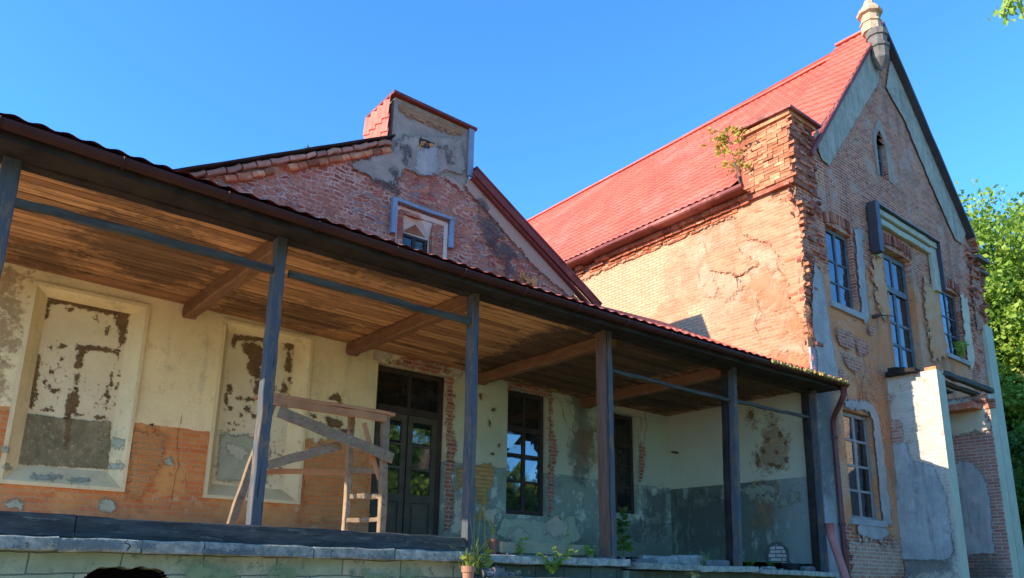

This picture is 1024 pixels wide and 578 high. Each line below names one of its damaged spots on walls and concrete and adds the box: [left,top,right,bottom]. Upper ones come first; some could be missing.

flaking render [399,100,464,149]
peeling [29,298,131,421]
peeling [224,334,264,419]
peeling [274,343,294,394]
flaking render [442,366,463,536]
peeling [475,382,581,544]
peeling [755,423,789,470]